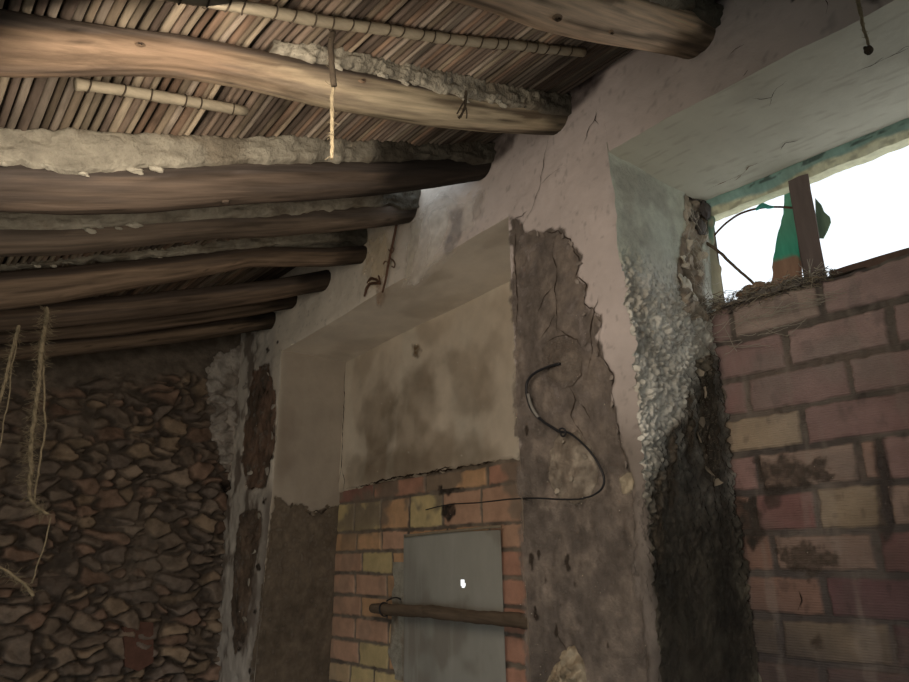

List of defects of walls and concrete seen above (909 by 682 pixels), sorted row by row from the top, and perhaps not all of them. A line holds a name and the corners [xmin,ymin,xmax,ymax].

flaking render [677,194,711,321]
flaking render [205,341,339,682]
flaking render [509,218,649,682]
leakage [647,365,784,682]